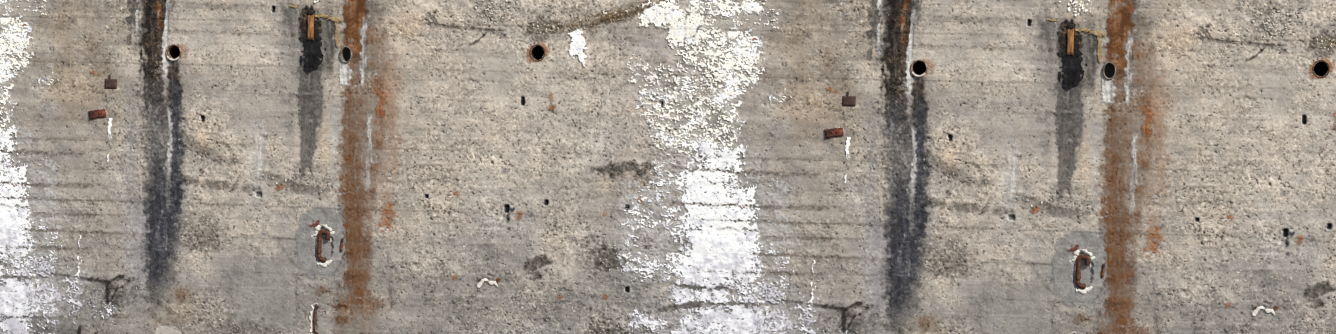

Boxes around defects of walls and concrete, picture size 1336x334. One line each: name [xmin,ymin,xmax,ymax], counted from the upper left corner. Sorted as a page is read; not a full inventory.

peeling [0,0,137,334]
water stain [126,0,186,286]
water stain [285,4,335,168]
corrosion [334,0,398,329]
peeling [592,0,878,334]
water stain [862,0,931,313]
water stain [1042,18,1097,190]
corrosion [1098,0,1165,334]